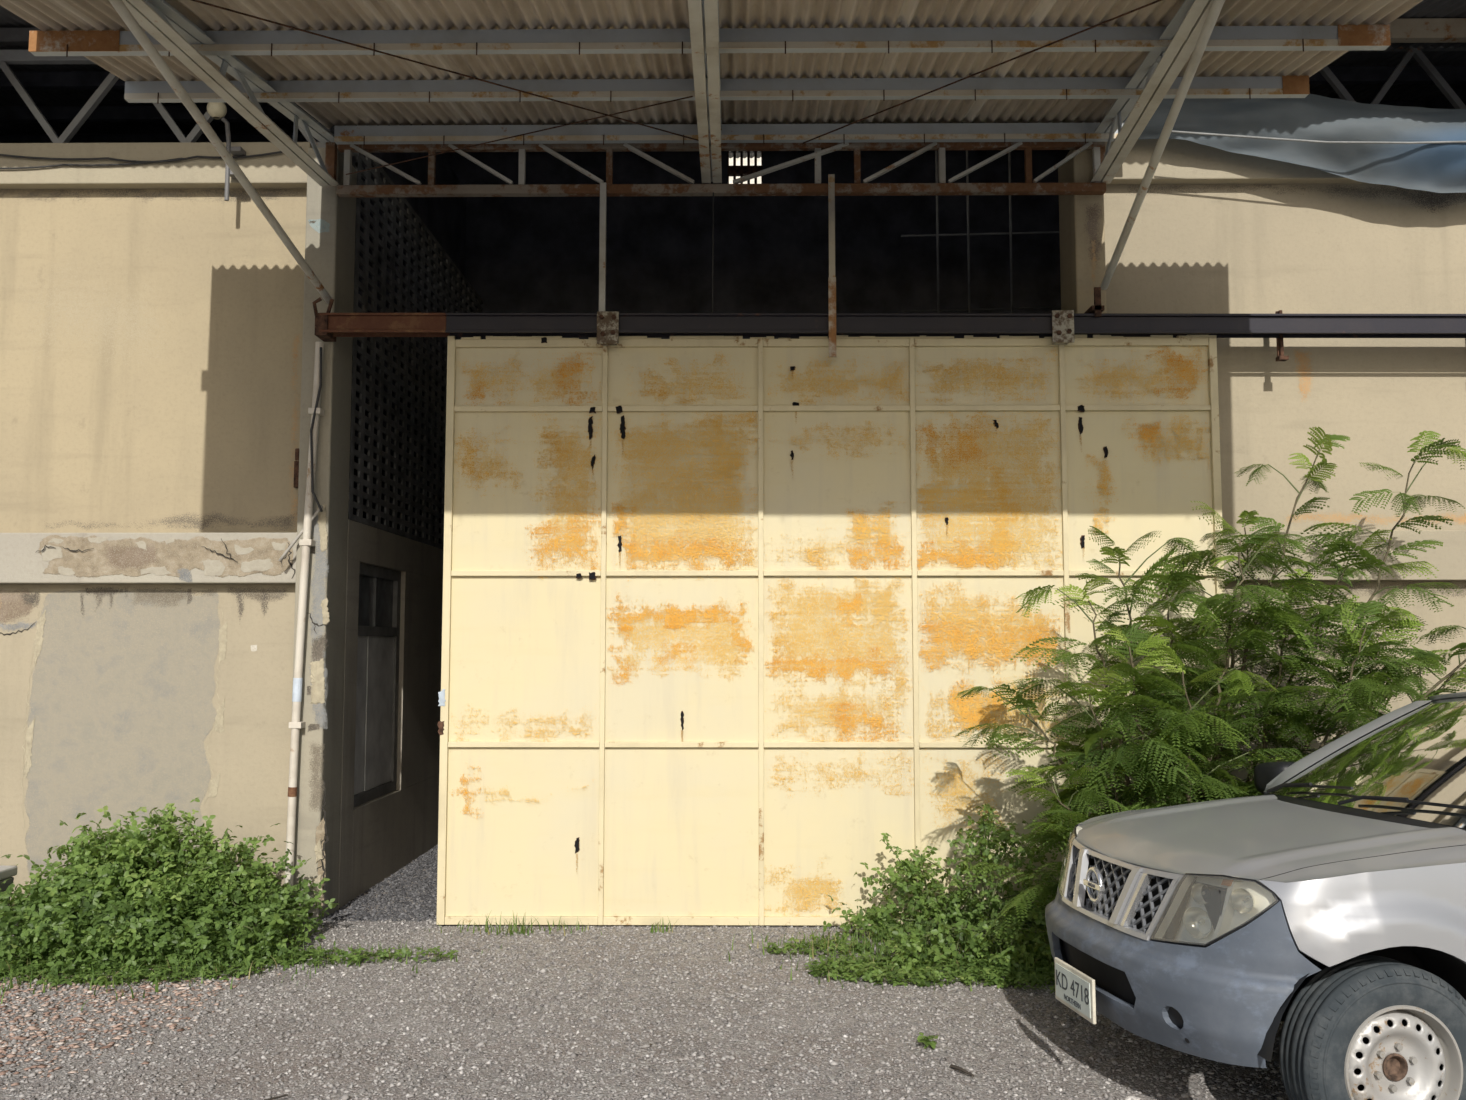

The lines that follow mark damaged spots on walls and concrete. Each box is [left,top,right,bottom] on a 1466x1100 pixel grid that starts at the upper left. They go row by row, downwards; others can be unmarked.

rust [1077,405,1118,558]
peeling [0,535,294,885]
flaking render [309,504,330,729]
rust [764,858,852,917]